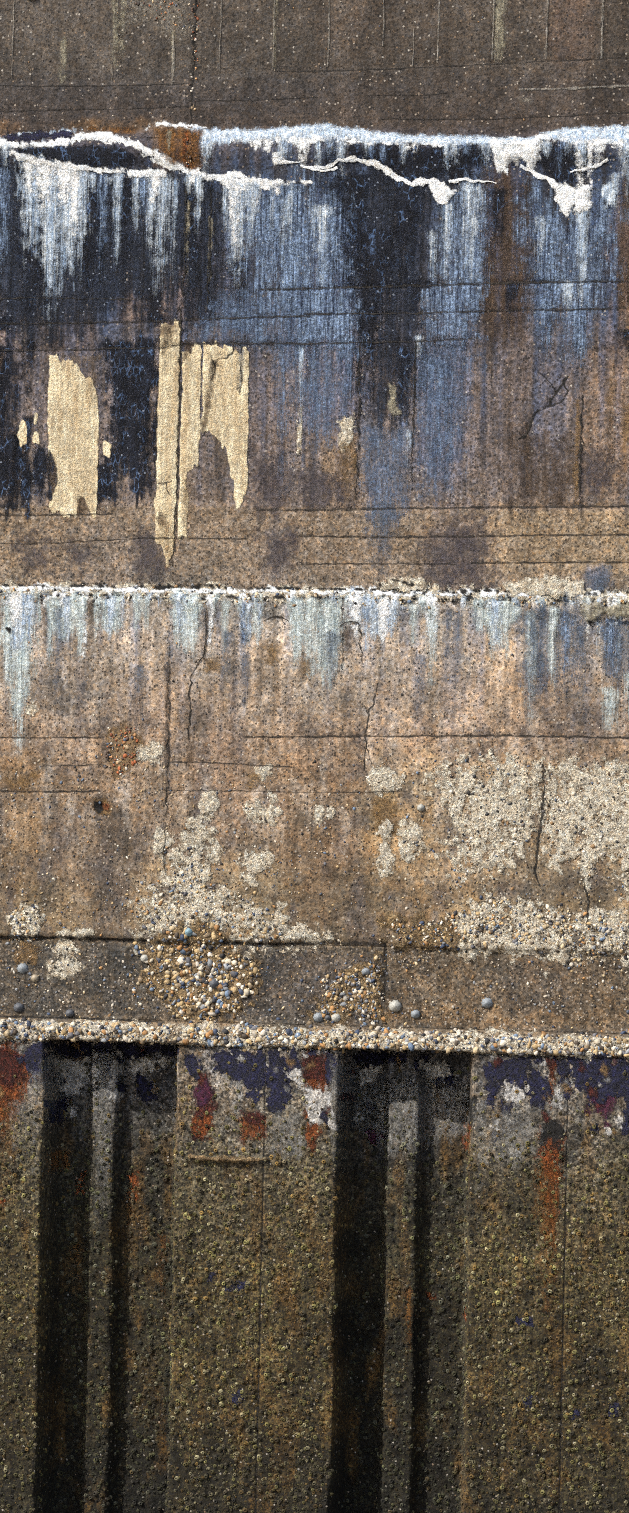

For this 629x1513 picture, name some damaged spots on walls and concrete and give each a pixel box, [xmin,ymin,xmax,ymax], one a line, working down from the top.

crack [189,0,198,125]
rust [156,129,203,169]
damp [0,121,629,536]
spalling [0,321,629,658]
damp [0,589,121,743]
damp [172,588,263,652]
damp [287,524,583,689]
damp [601,621,629,728]
rust [0,1040,33,1132]
rust [191,1072,217,1140]
rust [302,1050,329,1152]
rust [536,1119,566,1263]